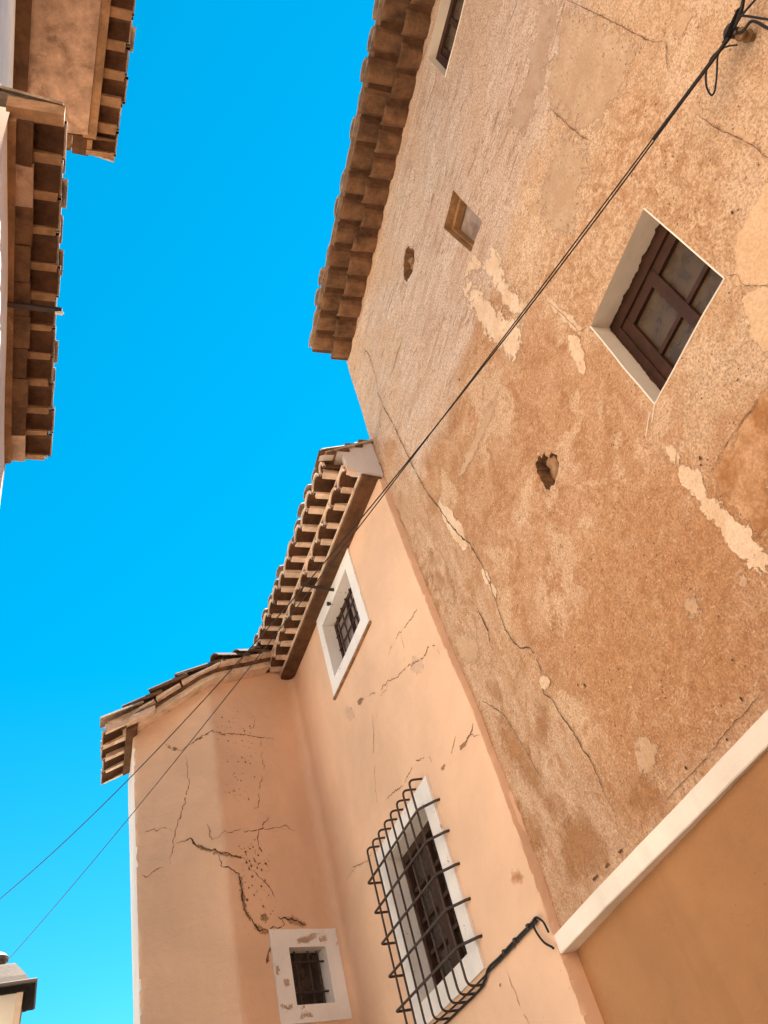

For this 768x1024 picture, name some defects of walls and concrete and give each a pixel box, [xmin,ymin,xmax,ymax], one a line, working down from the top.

spalling [403,244,417,286]
peeling [461,236,527,365]
spalling [534,451,559,500]
peeling [698,379,768,553]
crack [363,347,631,849]
crack [666,690,764,801]
crack [142,720,305,964]